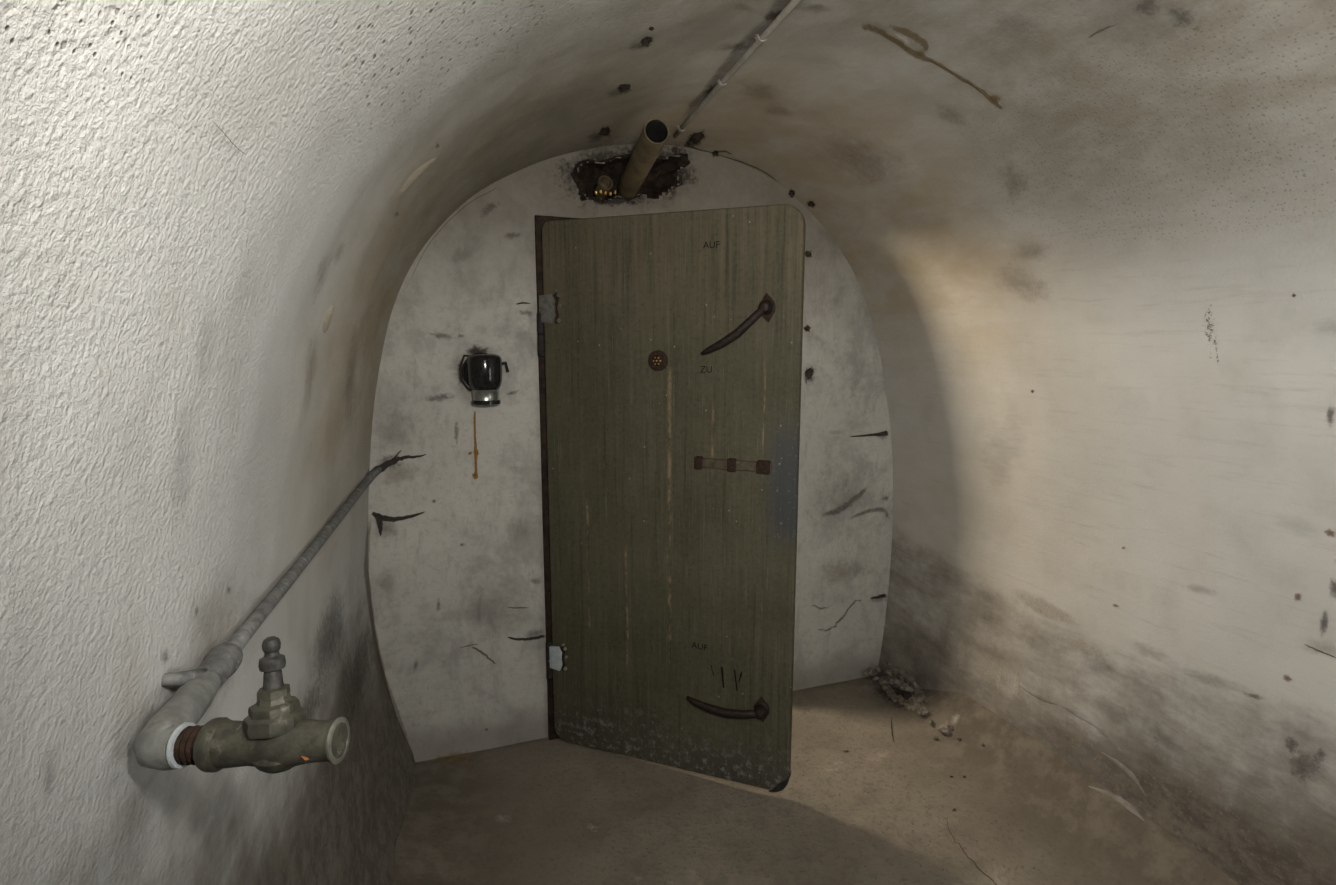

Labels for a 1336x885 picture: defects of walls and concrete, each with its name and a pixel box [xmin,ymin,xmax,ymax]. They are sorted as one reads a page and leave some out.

crack [864,24,1001,109]
spalling [571,129,731,203]
crack [371,450,426,476]
corrosion [469,412,479,479]
crack [372,512,424,536]